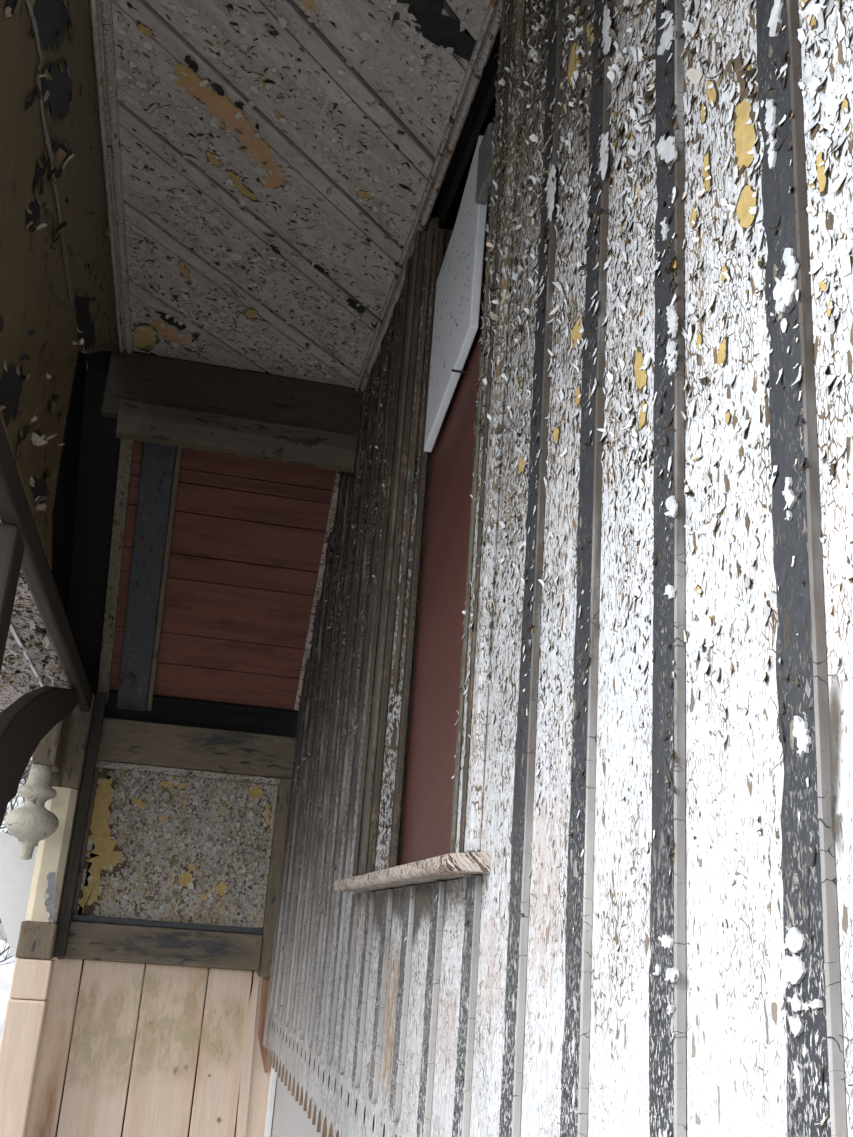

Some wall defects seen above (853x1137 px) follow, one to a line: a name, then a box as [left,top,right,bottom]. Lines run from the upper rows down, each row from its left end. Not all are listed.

peeling [0,0,114,527]
peeling [114,0,853,981]
peeling [0,570,71,692]
peeling [44,872,57,923]
peeling [77,768,143,916]
peeling [592,944,632,989]
peeling [780,995,813,1038]
crack [839,1003,853,1130]